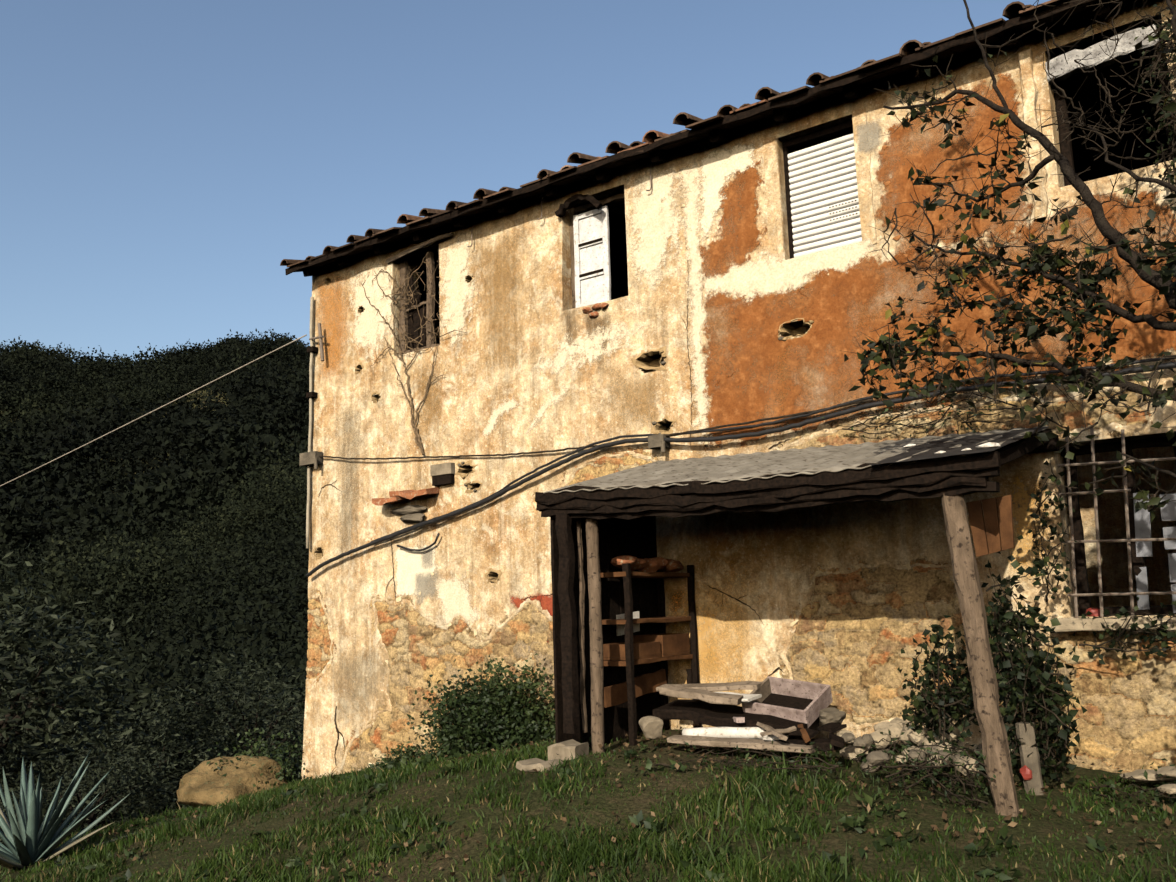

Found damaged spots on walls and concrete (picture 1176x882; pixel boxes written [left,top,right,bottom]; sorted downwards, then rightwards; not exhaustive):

peeling [680,68,1176,450]
spalling [631,346,666,370]
spalling [651,414,677,434]
flaking render [306,587,337,683]
flaking render [336,592,555,774]
flaking render [776,553,974,731]